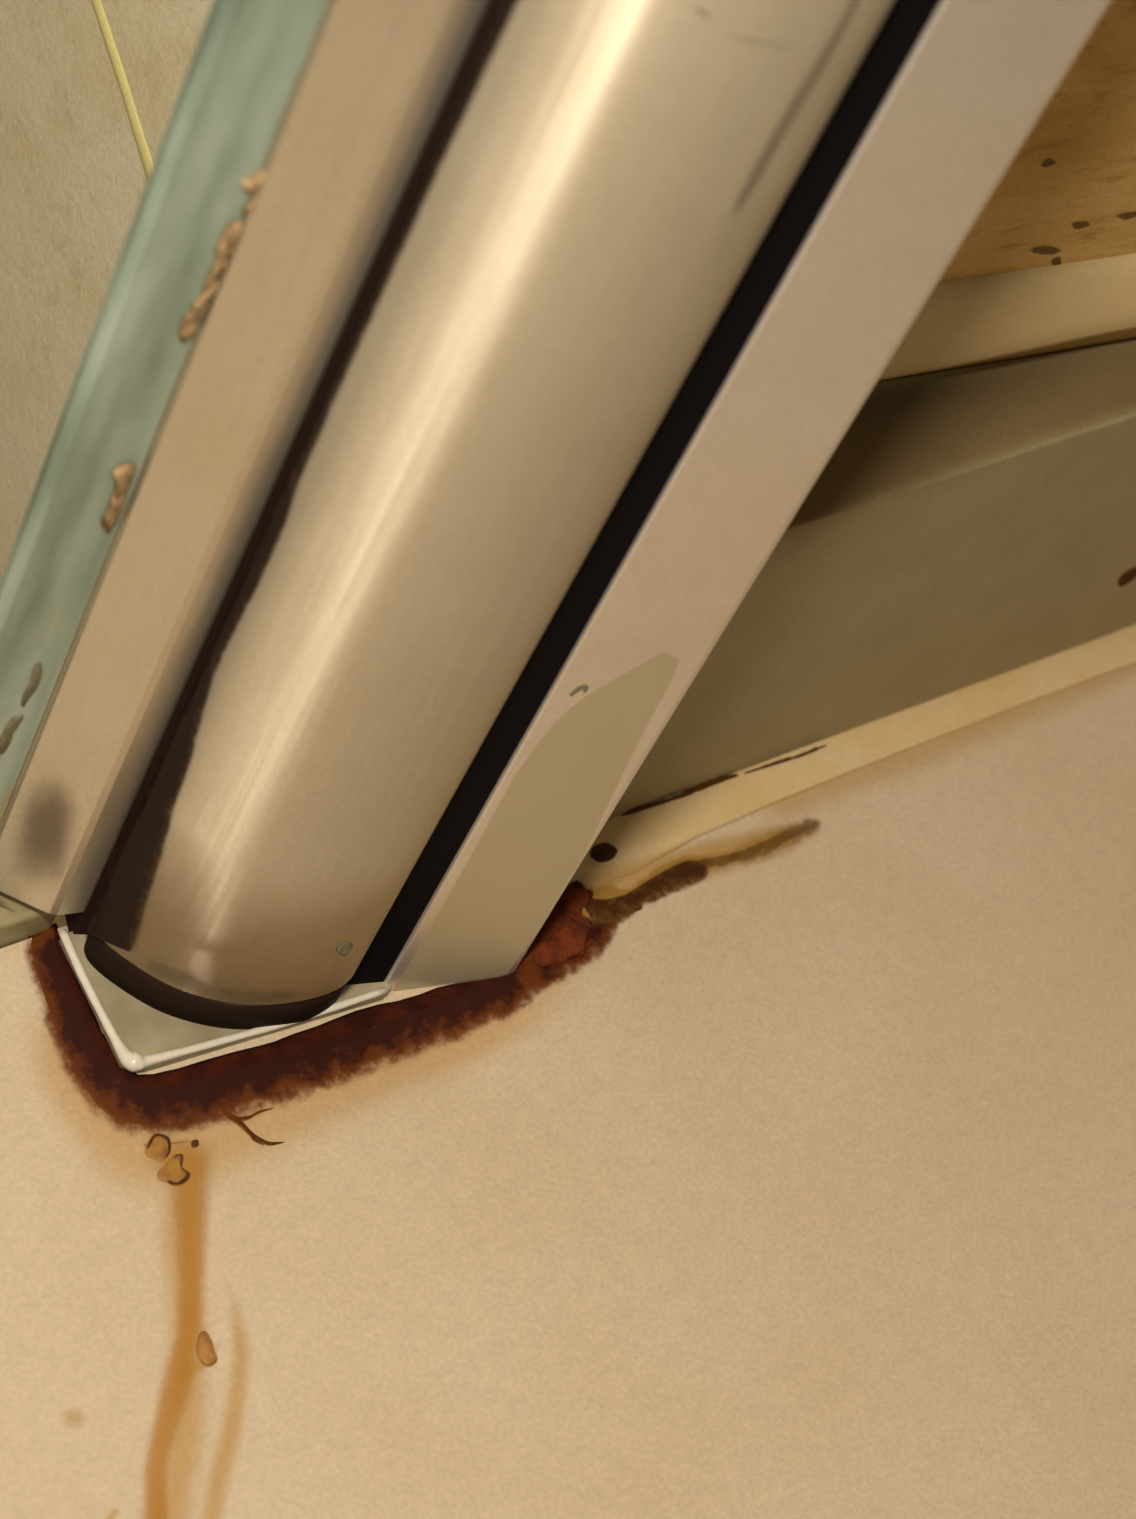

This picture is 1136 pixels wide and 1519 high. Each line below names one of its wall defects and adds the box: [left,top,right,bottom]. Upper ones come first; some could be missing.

corrosion [27,820,819,1131]
corrosion [148,1152,217,1519]